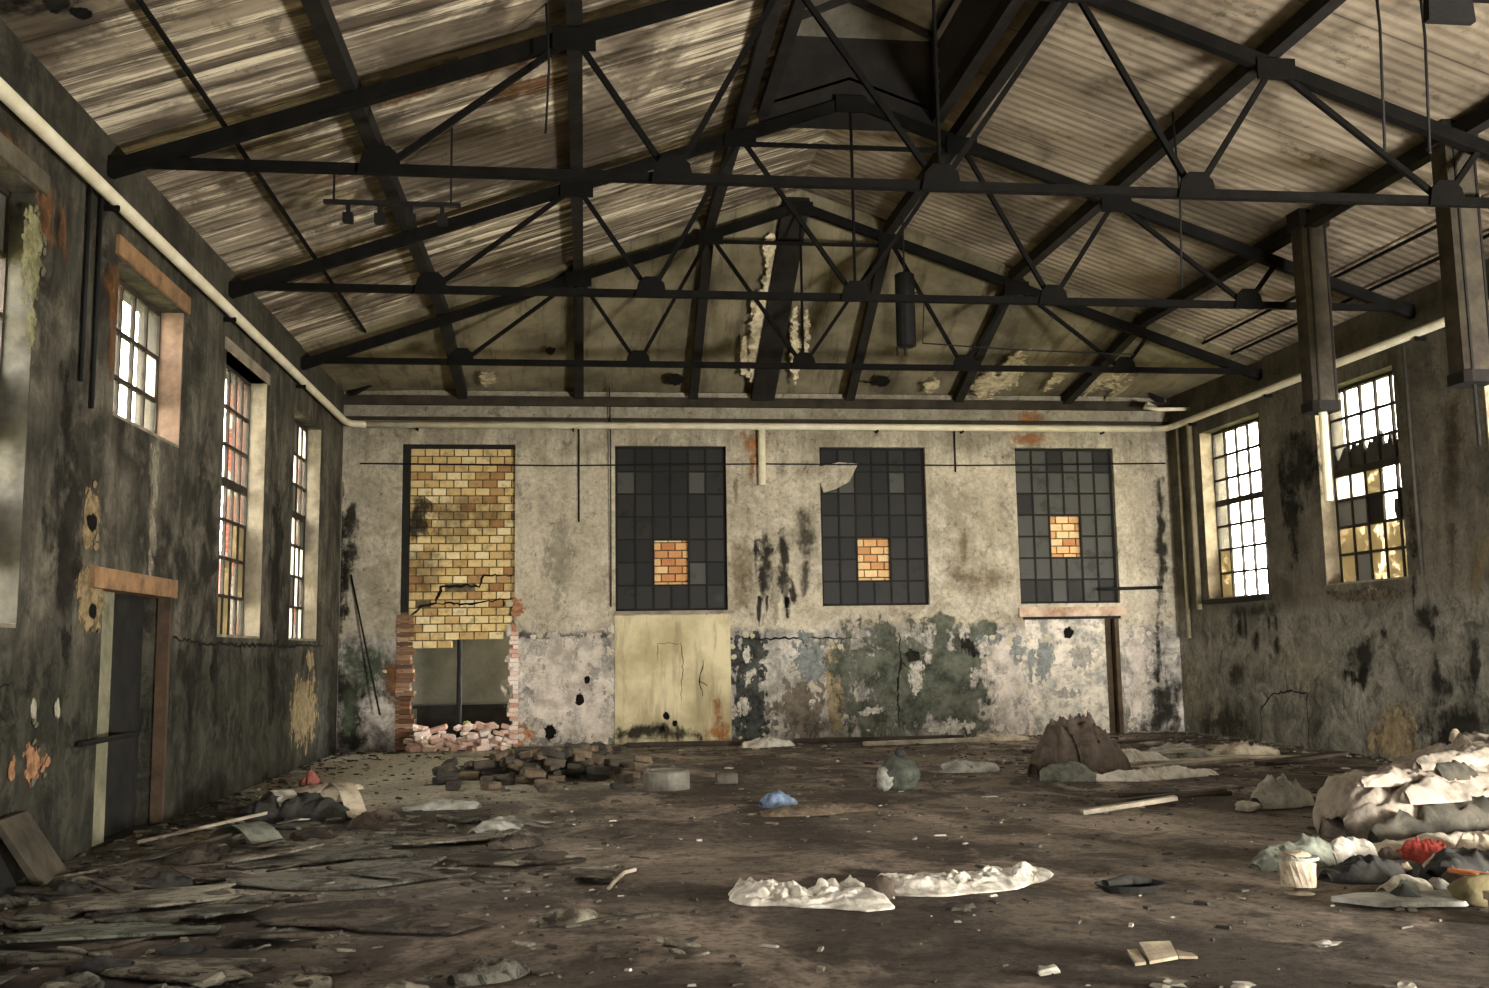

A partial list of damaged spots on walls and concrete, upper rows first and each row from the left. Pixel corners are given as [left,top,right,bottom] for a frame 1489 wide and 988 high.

water stain [753,511,815,622]
water stain [62,632,71,663]
crack [411,574,512,615]
water stain [1233,604,1279,653]
water stain [1412,584,1439,641]
spalling [382,664,405,704]
peeling [730,611,1098,741]
water stain [1344,666,1367,691]
water stain [1417,638,1489,746]
water stain [1203,698,1255,738]
spalling [8,698,60,788]